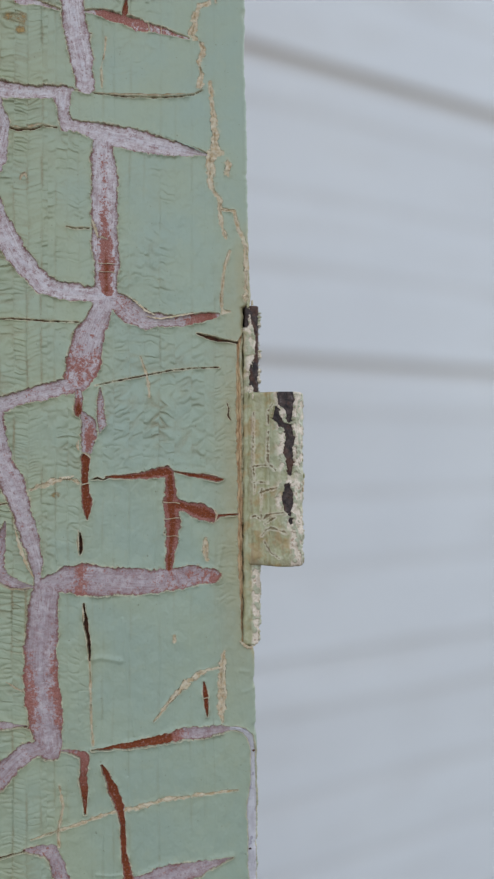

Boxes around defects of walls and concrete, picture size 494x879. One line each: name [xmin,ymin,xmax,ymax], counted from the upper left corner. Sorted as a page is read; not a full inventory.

peeling [188,0,253,315]
crack [0,0,249,879]
corrosion [243,306,259,392]
corrosion [272,392,295,525]
peeling [217,650,257,879]